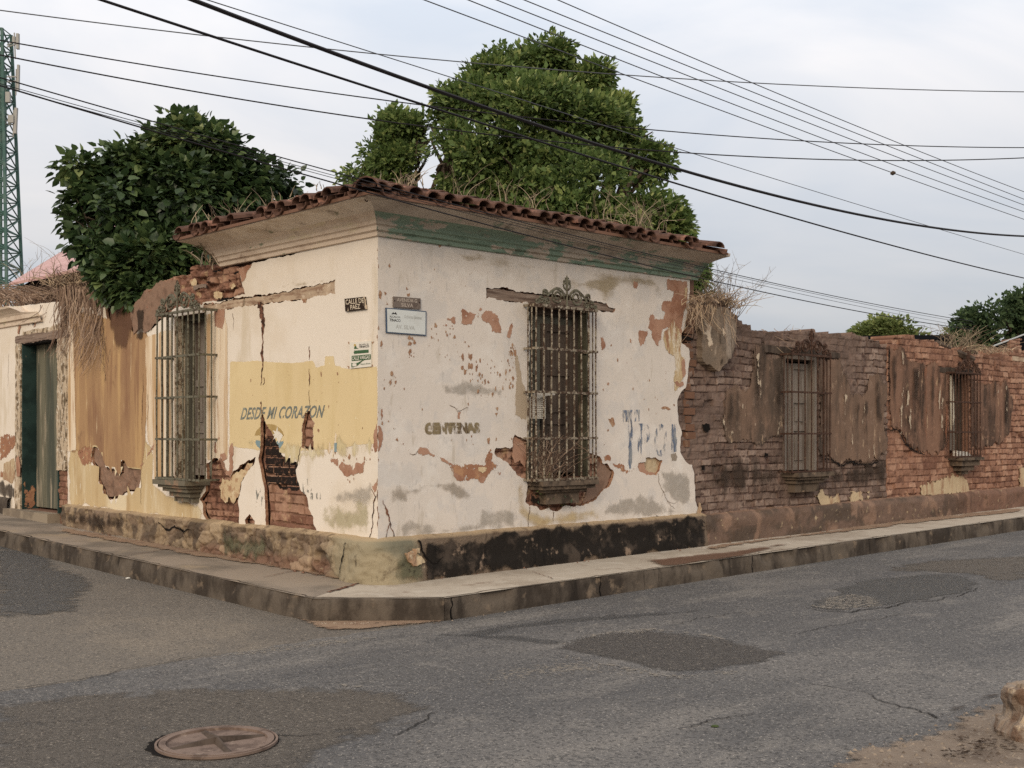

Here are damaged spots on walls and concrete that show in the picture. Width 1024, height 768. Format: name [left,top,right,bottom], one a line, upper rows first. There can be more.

damp [111,310,144,347]
flaking render [130,264,252,335]
crack [257,302,265,414]
peeling [431,308,516,417]
peeling [630,279,693,391]
damp [893,352,949,437]
flaking render [78,446,154,497]
flaking render [204,425,316,530]
flaking render [418,436,677,511]
damp [834,448,885,484]
damp [398,498,705,580]